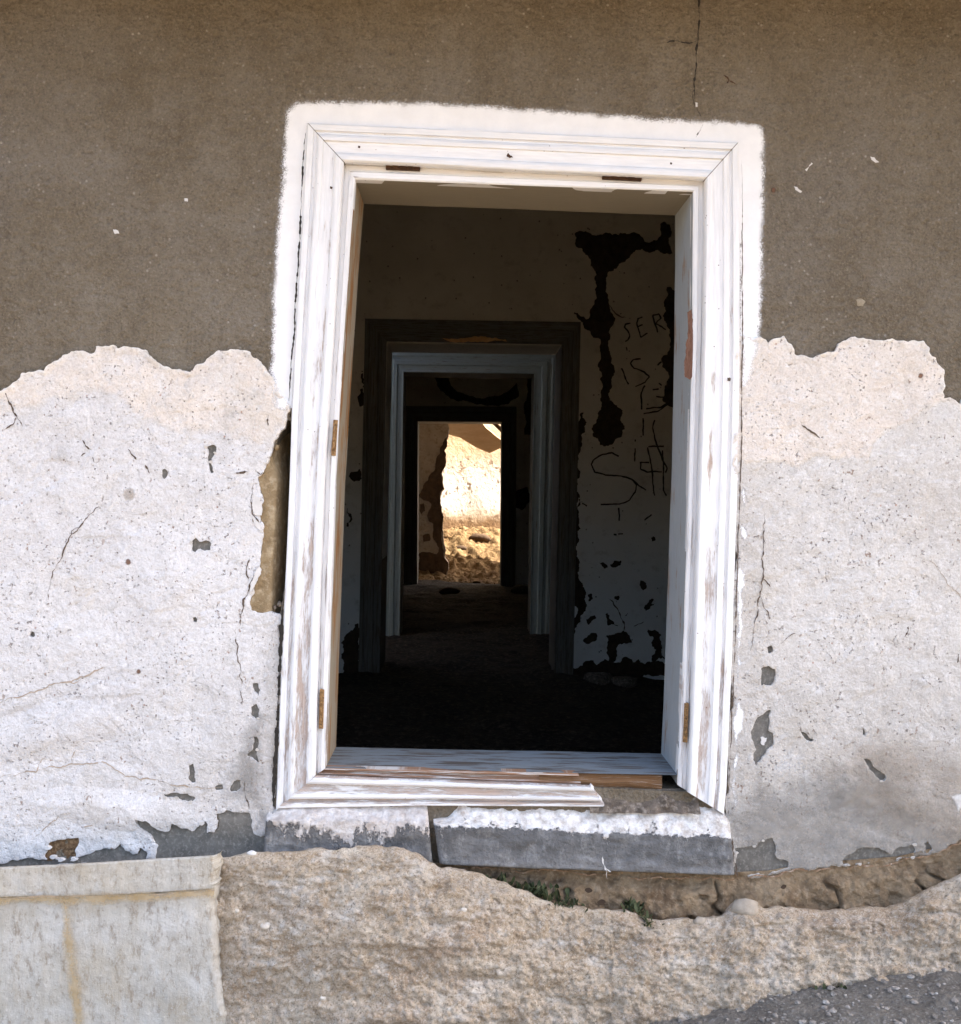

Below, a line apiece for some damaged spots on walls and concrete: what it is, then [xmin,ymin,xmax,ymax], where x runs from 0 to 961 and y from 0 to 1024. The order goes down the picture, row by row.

crack [667,0,703,137]
peeling [204,445,216,473]
peeling [573,222,673,677]
crack [728,189,770,791]
crack [48,507,98,599]
peeling [190,538,211,552]
spalling [250,432,291,613]
peeling [251,683,260,719]
peeling [761,666,775,687]
peeling [751,710,776,764]
peeling [163,793,195,804]
peeling [0,810,265,867]